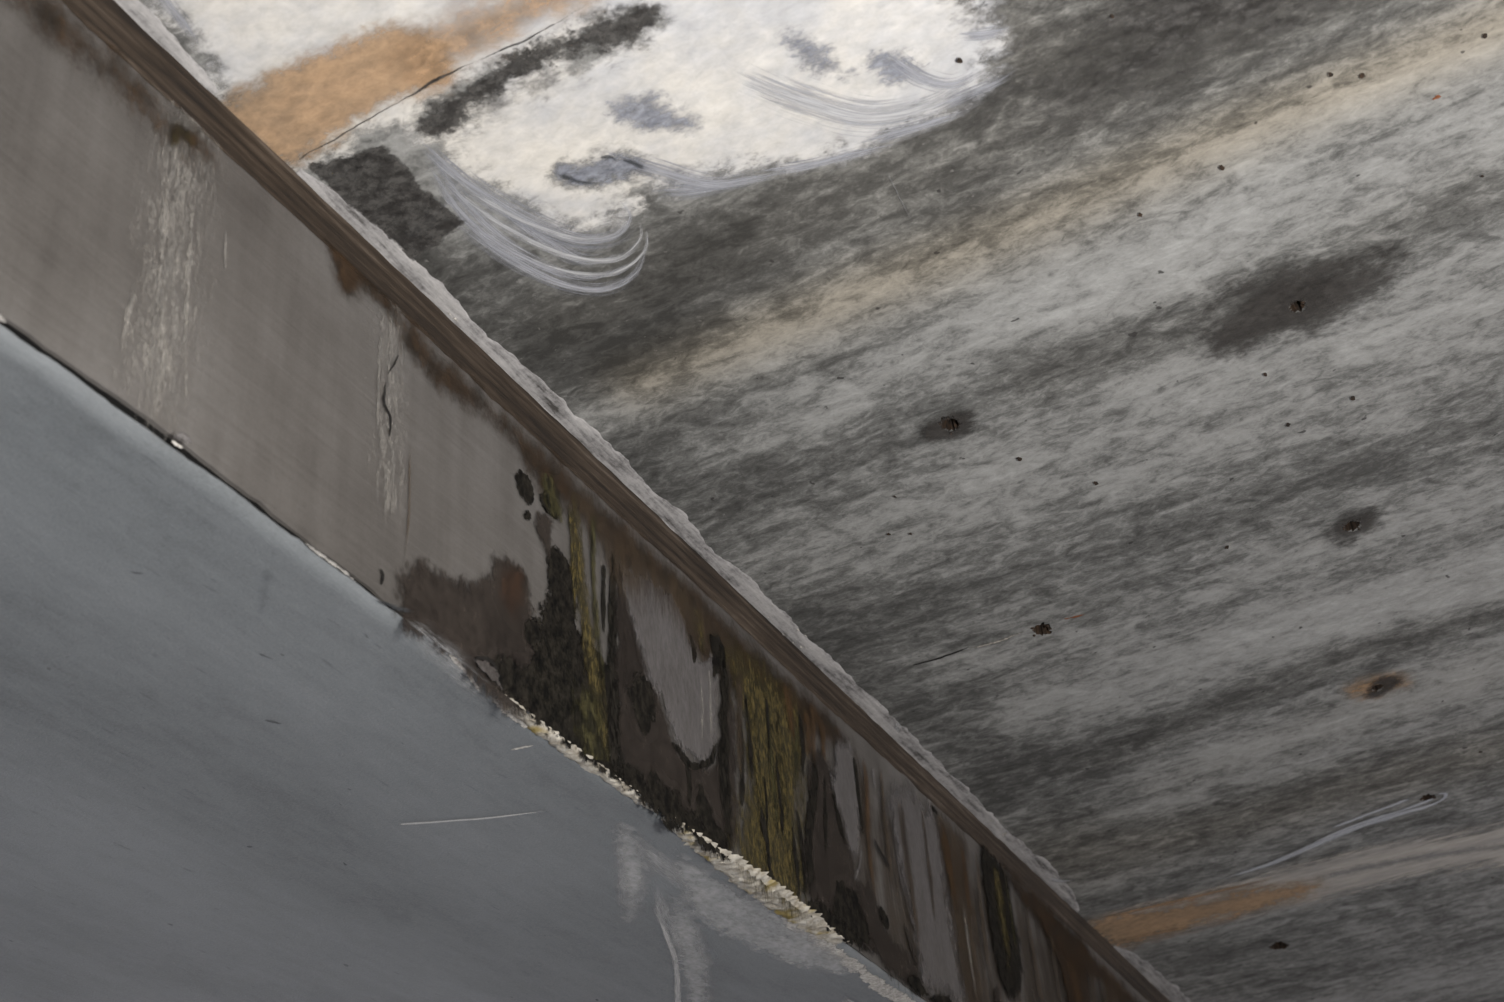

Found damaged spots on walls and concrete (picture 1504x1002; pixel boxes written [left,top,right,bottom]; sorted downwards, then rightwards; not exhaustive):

leakage [124,101,207,410]
leakage [1201,246,1407,358]
crack [382,355,399,436]
leakage [377,308,410,535]
leakage [397,556,536,723]
leakage [542,474,826,899]
rust [1352,675,1402,699]